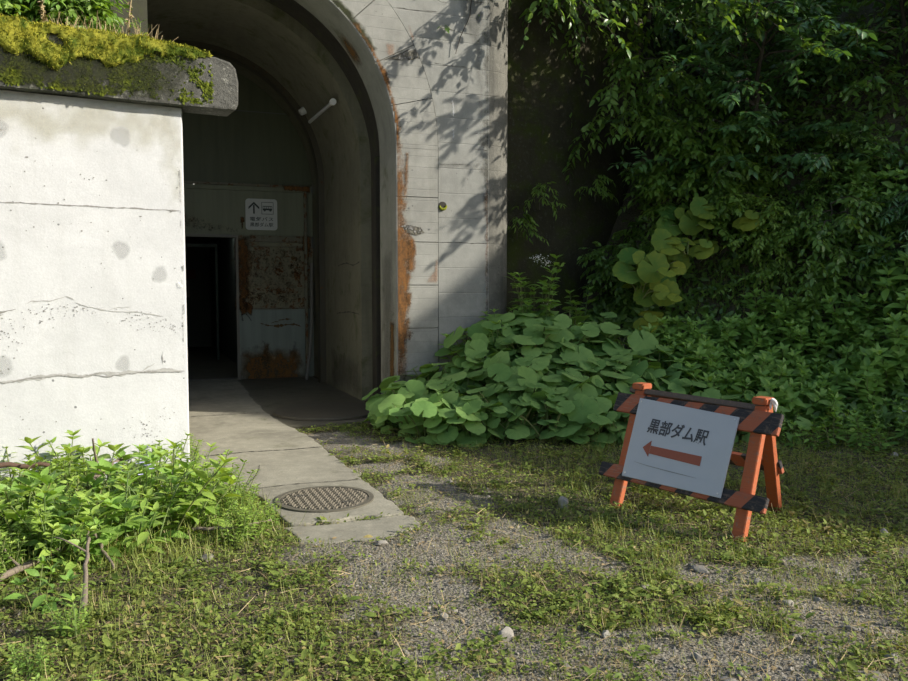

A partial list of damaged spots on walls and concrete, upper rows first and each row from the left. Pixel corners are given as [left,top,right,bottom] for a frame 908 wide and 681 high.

spalling [388,49,422,62]
corrosion [354,24,415,379]
spalling [402,225,432,235]
crack [0,296,160,316]
crack [0,353,184,384]
corrosion [241,345,302,379]